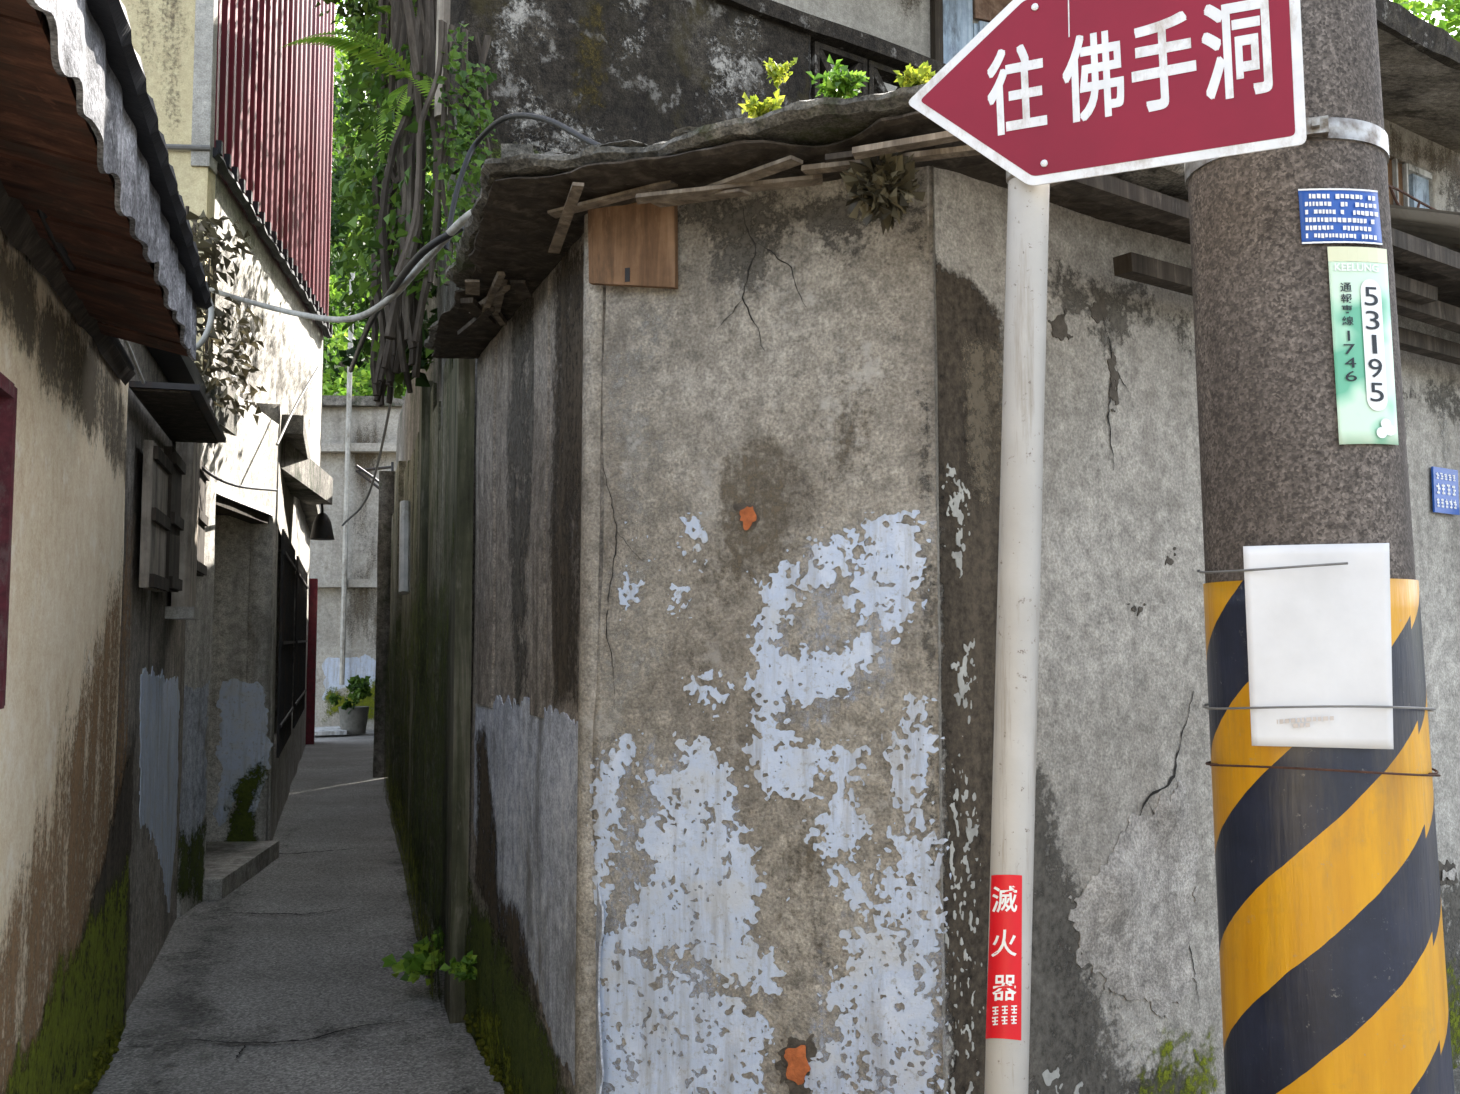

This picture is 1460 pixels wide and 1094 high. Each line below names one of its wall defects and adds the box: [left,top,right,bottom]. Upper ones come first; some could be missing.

damp [0,233,128,485]
crack [1103,317,1125,463]
damp [61,725,137,1026]
peeling [474,463,984,1094]
crack [1139,691,1194,816]